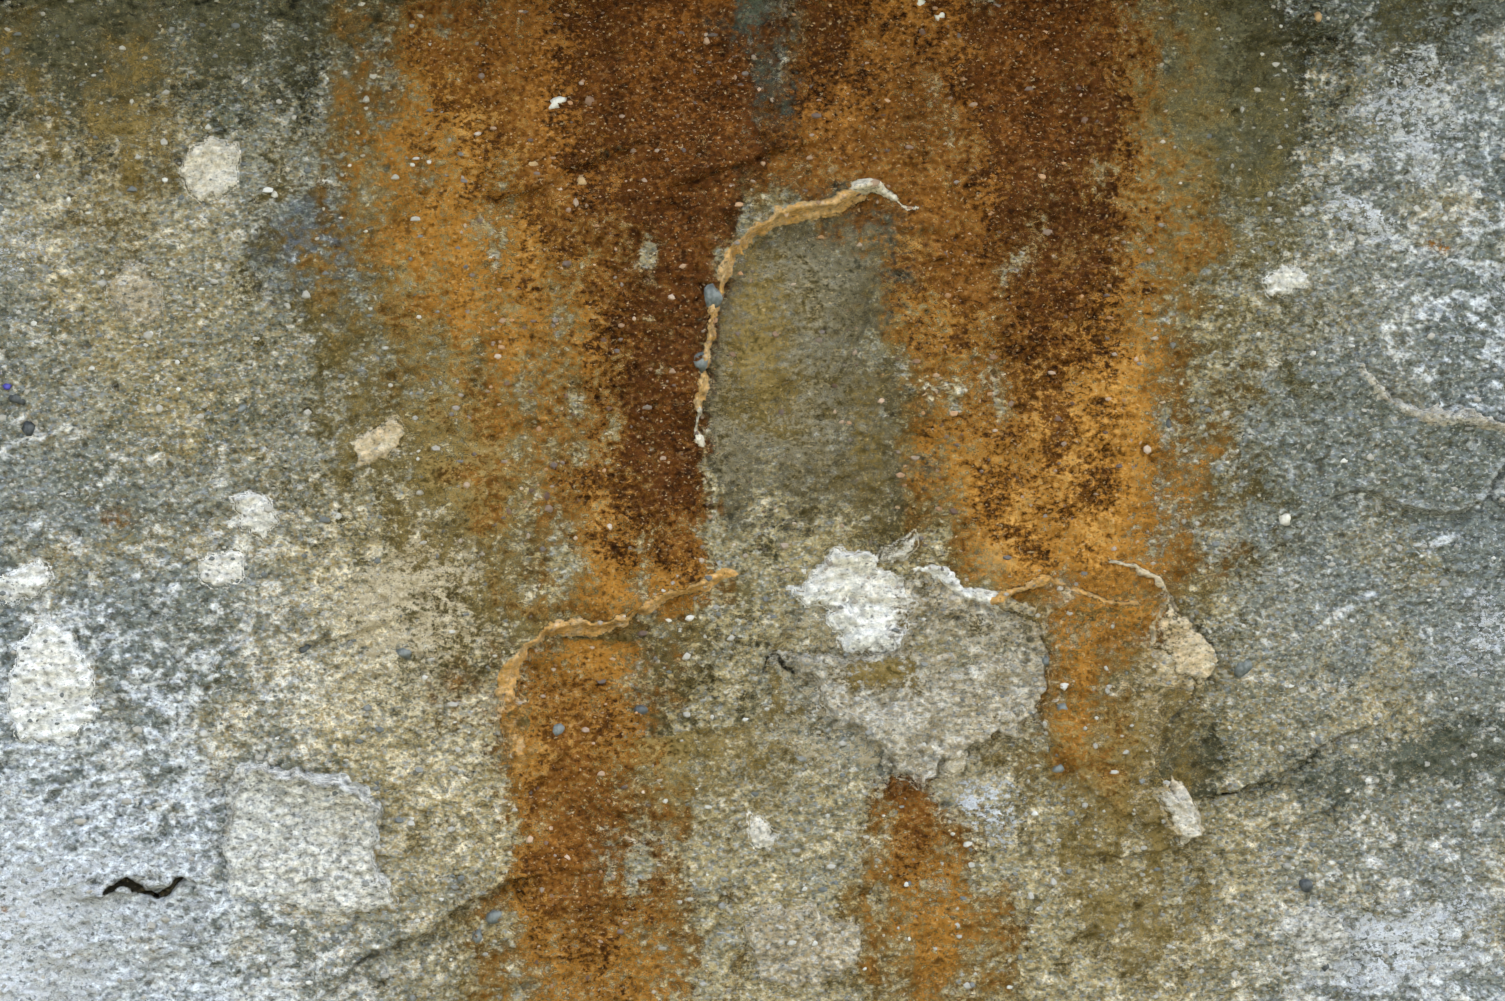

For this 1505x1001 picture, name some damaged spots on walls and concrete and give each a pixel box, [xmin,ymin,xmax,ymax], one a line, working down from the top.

rust [233,0,1356,1001]
peeling [692,178,1050,805]
crack [102,877,183,899]
peeling [1161,789,1202,847]